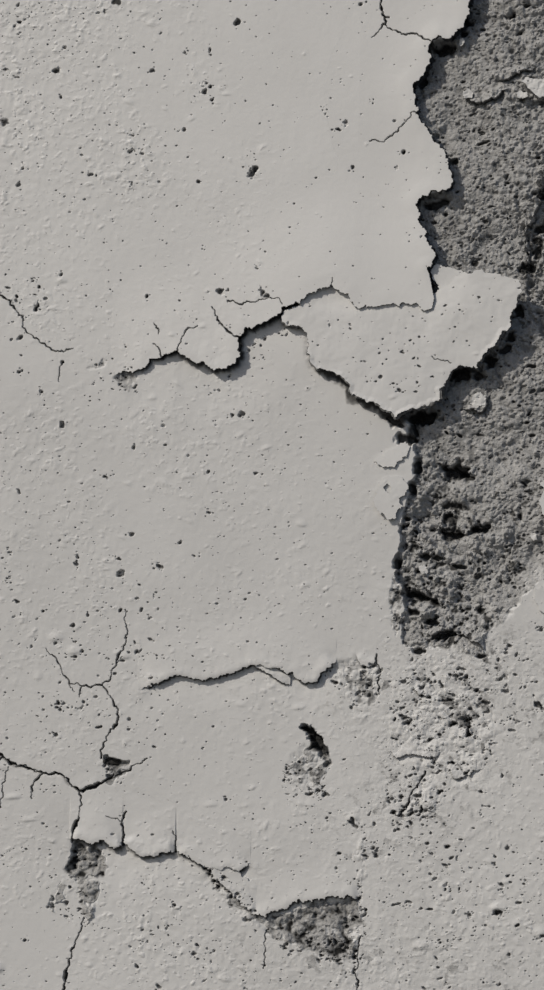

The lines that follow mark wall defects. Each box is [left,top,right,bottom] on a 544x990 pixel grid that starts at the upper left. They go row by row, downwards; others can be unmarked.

crack [370,0,436,48]
crack [0,293,75,383]
spalling [74,0,544,824]
crack [0,608,149,847]
crack [170,830,178,854]
spalling [0,713,375,961]
crack [61,916,86,990]
crack [262,928,270,971]